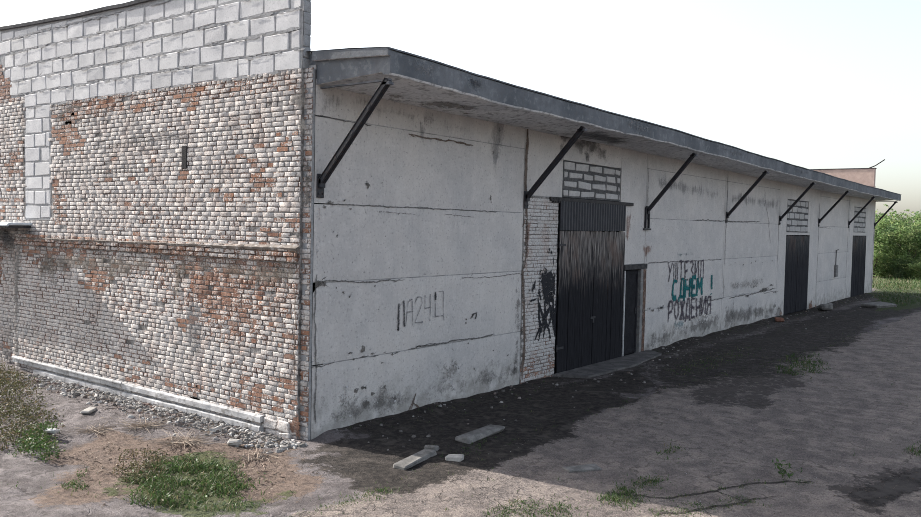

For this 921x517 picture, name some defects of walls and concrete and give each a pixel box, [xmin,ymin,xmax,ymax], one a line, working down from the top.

peeling [0,68,12,102]
peeling [173,87,204,111]
peeling [51,94,154,156]
peeling [22,245,119,294]
peeling [176,277,273,338]
damp [684,308,772,333]
peeling [278,329,298,359]